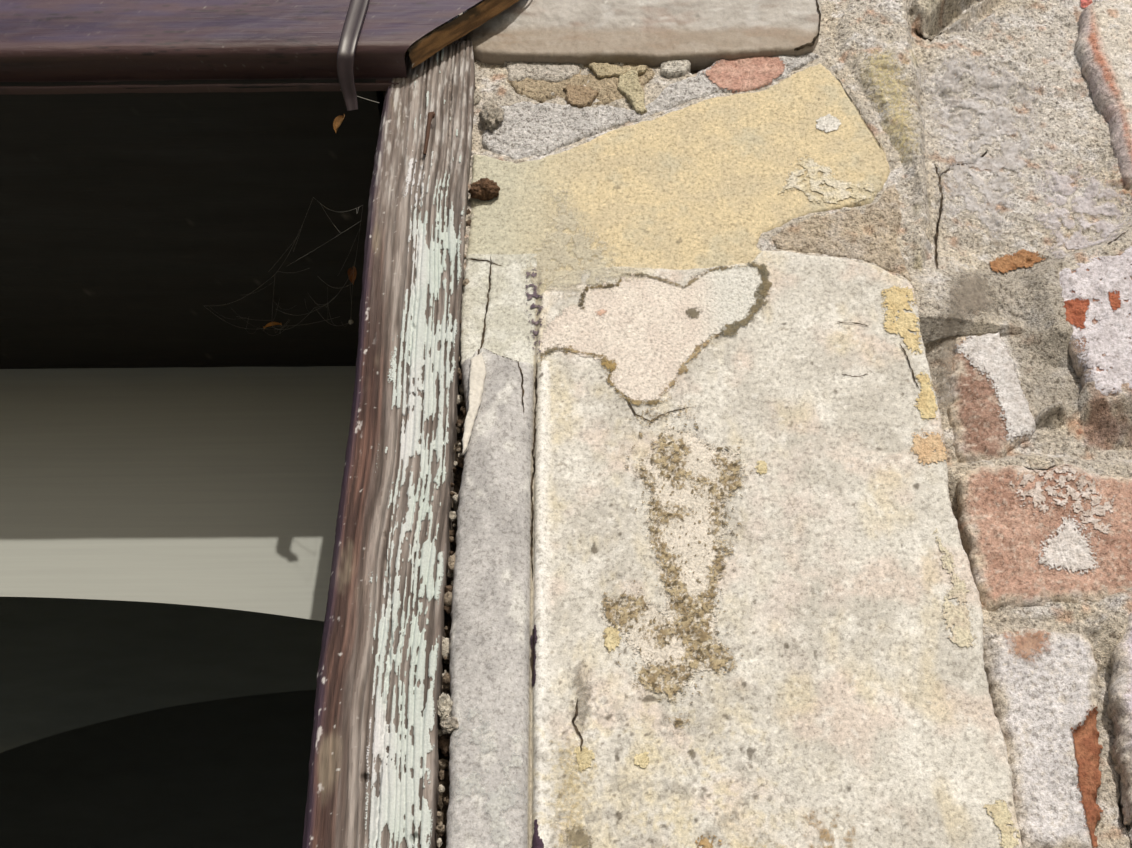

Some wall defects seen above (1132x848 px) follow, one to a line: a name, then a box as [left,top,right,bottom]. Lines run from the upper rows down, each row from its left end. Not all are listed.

crack [934,151,987,269]
peeling [524,264,763,402]
spalling [1063,298,1090,329]
spalling [1108,290,1121,312]
crack [466,256,537,581]
peeling [364,148,487,848]
crack [528,630,536,685]